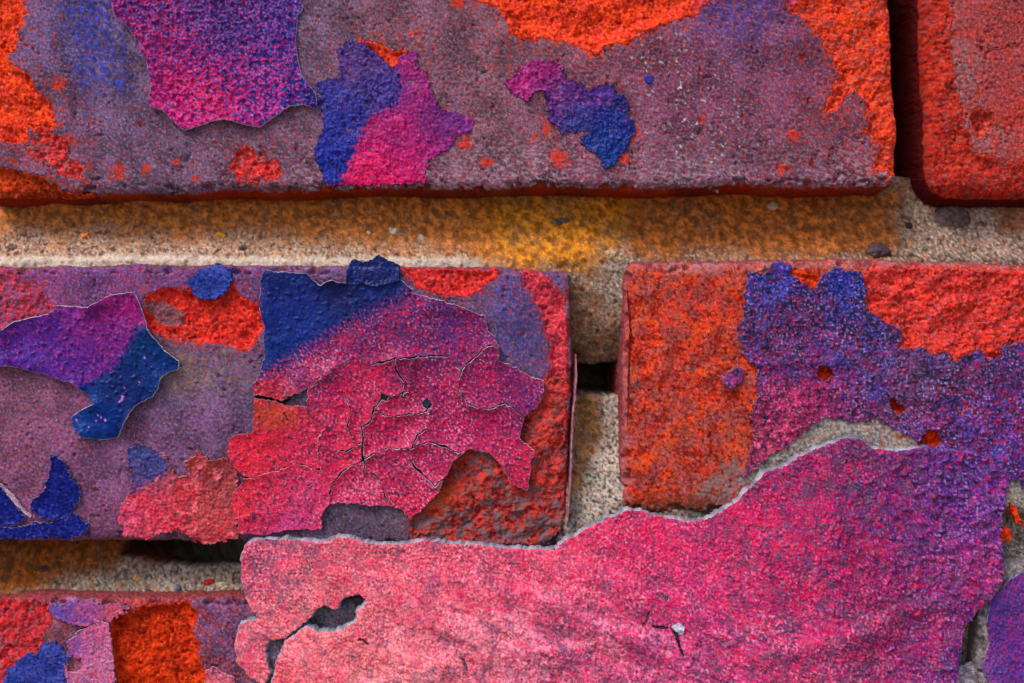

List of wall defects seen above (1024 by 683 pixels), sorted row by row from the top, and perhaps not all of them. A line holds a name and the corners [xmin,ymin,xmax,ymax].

peeling [110,0,475,189]
peeling [504,59,637,169]
crack [255,395,291,404]
crack [361,355,434,466]
peeling [0,255,1024,683]